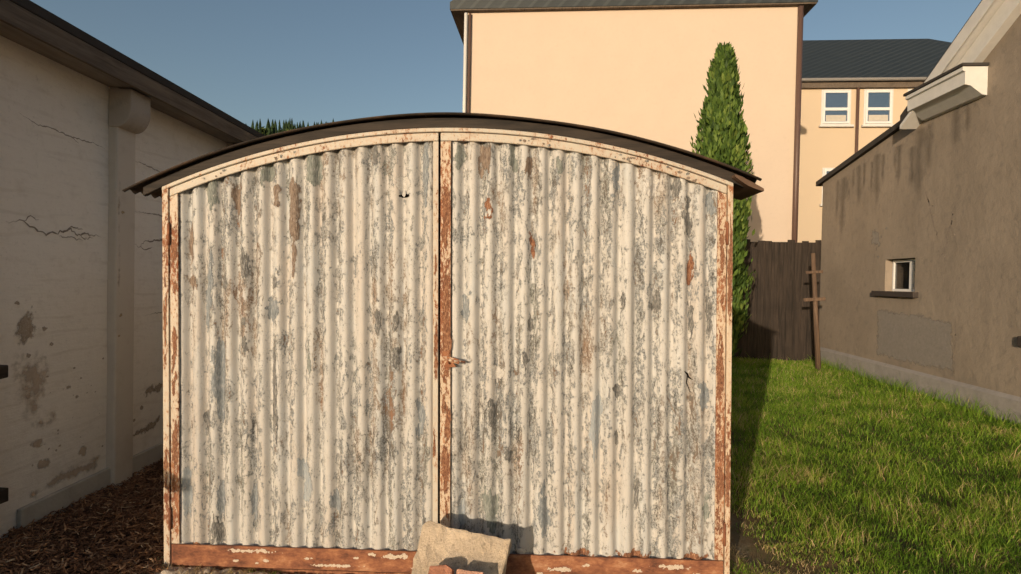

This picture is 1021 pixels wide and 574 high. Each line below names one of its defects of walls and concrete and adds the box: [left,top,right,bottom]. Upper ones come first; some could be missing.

crack [26,117,105,149]
peeling [506,138,551,179]
crack [10,215,101,241]
peeling [260,151,325,278]
rust [719,214,733,317]
peeling [203,328,226,438]
rust [433,188,453,519]
peeling [583,383,621,461]
rust [716,330,724,400]
peeling [211,466,276,564]
rust [554,547,651,558]
rust [716,413,730,535]